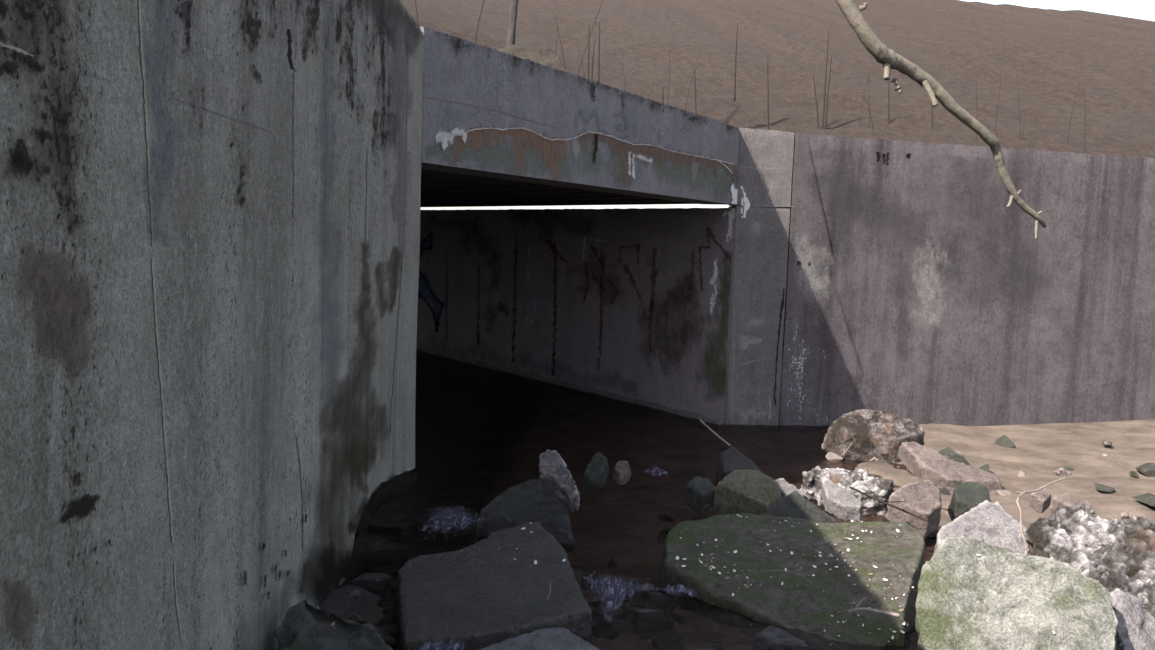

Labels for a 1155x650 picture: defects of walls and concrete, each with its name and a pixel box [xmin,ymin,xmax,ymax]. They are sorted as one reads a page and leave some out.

leakage [0,0,82,234]
leakage [174,0,193,52]
leakage [229,0,738,179]
corrosion [455,127,739,185]
leakage [708,259,719,316]
leakage [264,245,416,603]